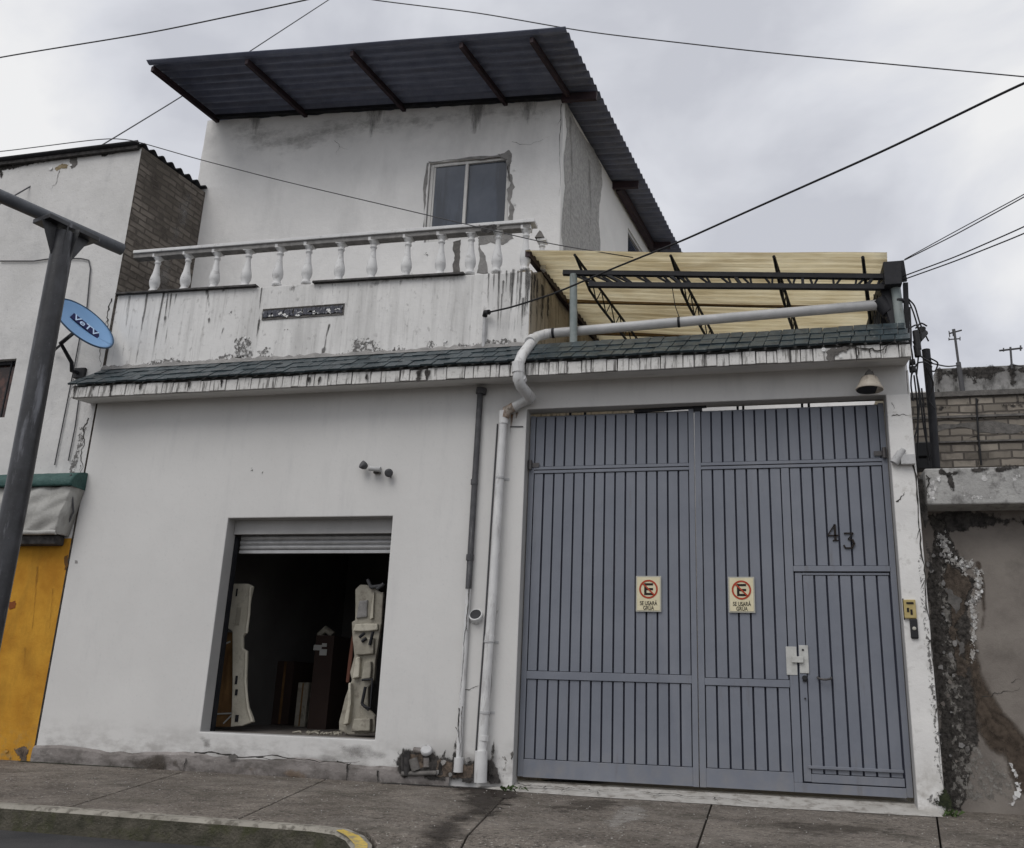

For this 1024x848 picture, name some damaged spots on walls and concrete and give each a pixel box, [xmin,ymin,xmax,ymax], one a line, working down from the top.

spalling [423,150,516,274]
leakage [154,293,177,344]
leakage [488,268,549,318]
peeling [144,336,270,365]
peeling [339,336,405,354]
leakage [917,476,1024,811]
peeling [918,554,1022,807]
spalling [436,757,474,778]